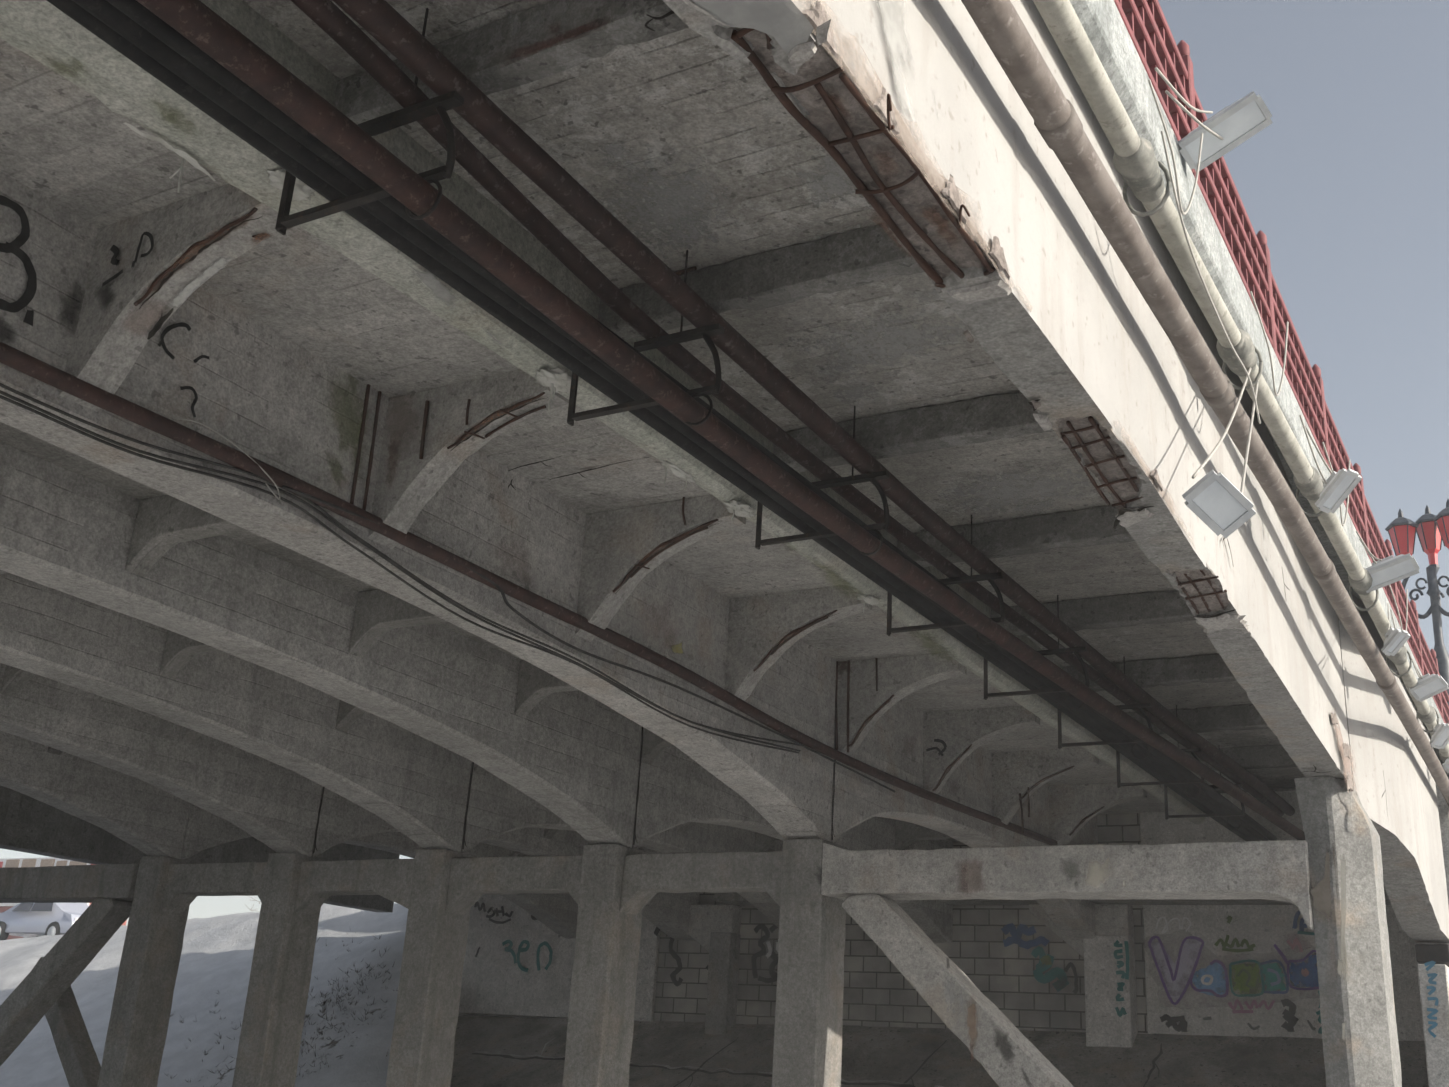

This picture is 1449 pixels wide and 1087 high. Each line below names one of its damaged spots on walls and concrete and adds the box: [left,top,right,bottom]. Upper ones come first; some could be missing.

spalling [683,0,1012,304]
spalling [1033,414,1184,529]
spalling [1168,569,1250,634]